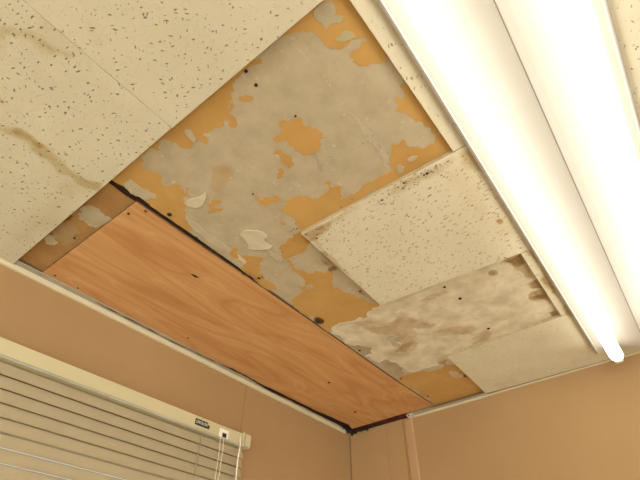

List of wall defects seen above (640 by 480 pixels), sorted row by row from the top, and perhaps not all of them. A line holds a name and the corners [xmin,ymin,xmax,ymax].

peeling [282,0,387,67]
peeling [45,222,80,246]
peeling [76,205,111,228]
peeling [112,59,559,407]